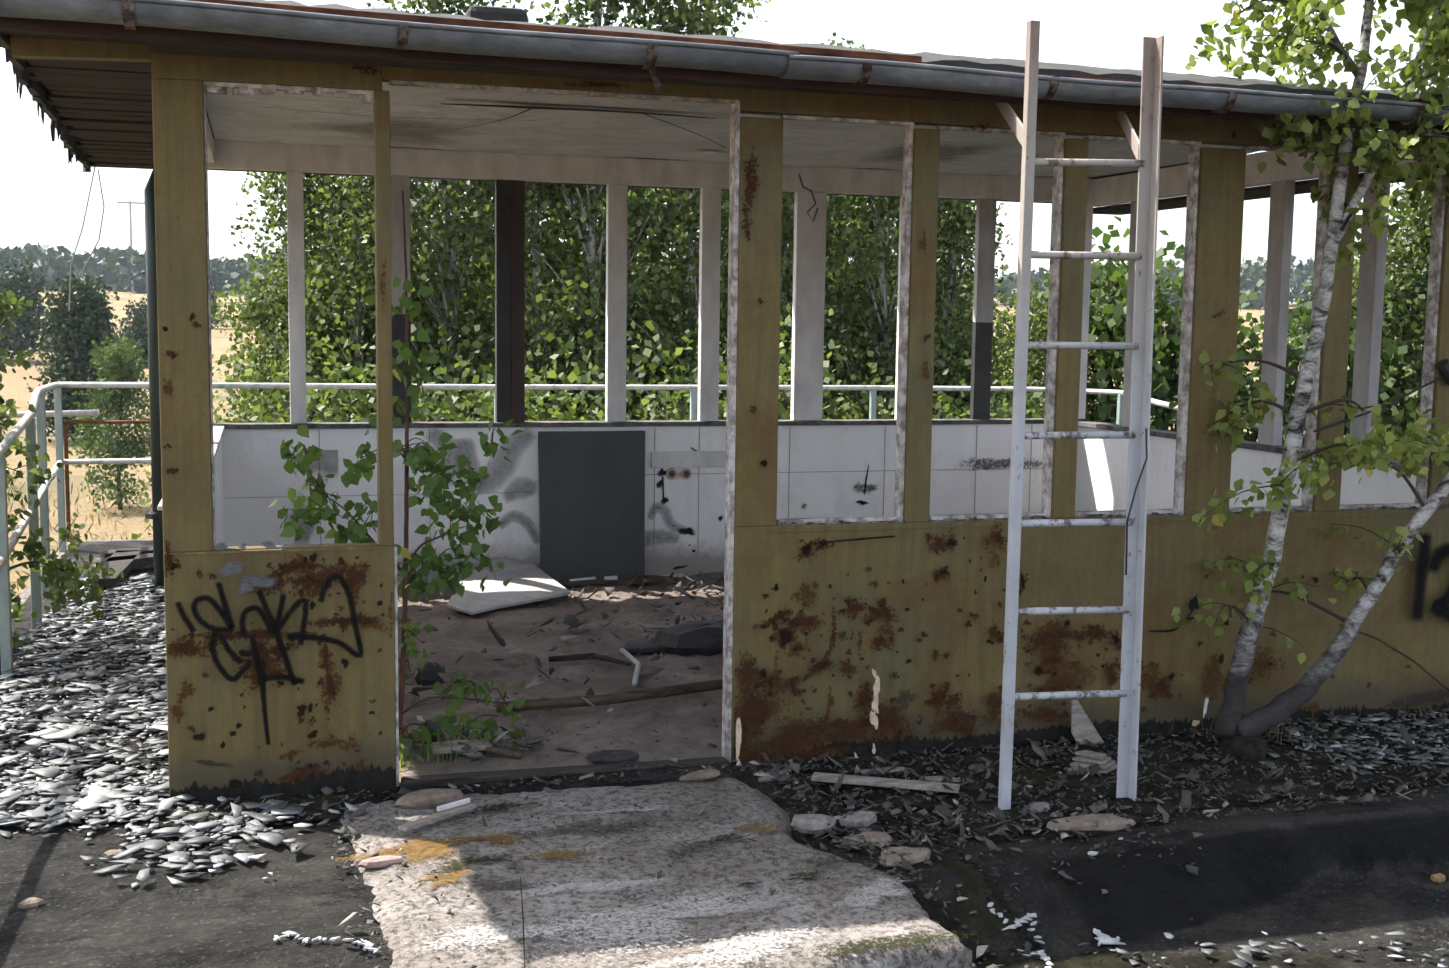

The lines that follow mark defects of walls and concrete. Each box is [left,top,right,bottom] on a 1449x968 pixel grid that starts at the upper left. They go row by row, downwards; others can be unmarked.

rust [741,147,761,241]
rust [164,539,217,580]
rust [166,553,394,785]
rust [496,521,1122,764]
peeling [854,669,880,758]
rust [1140,657,1183,712]